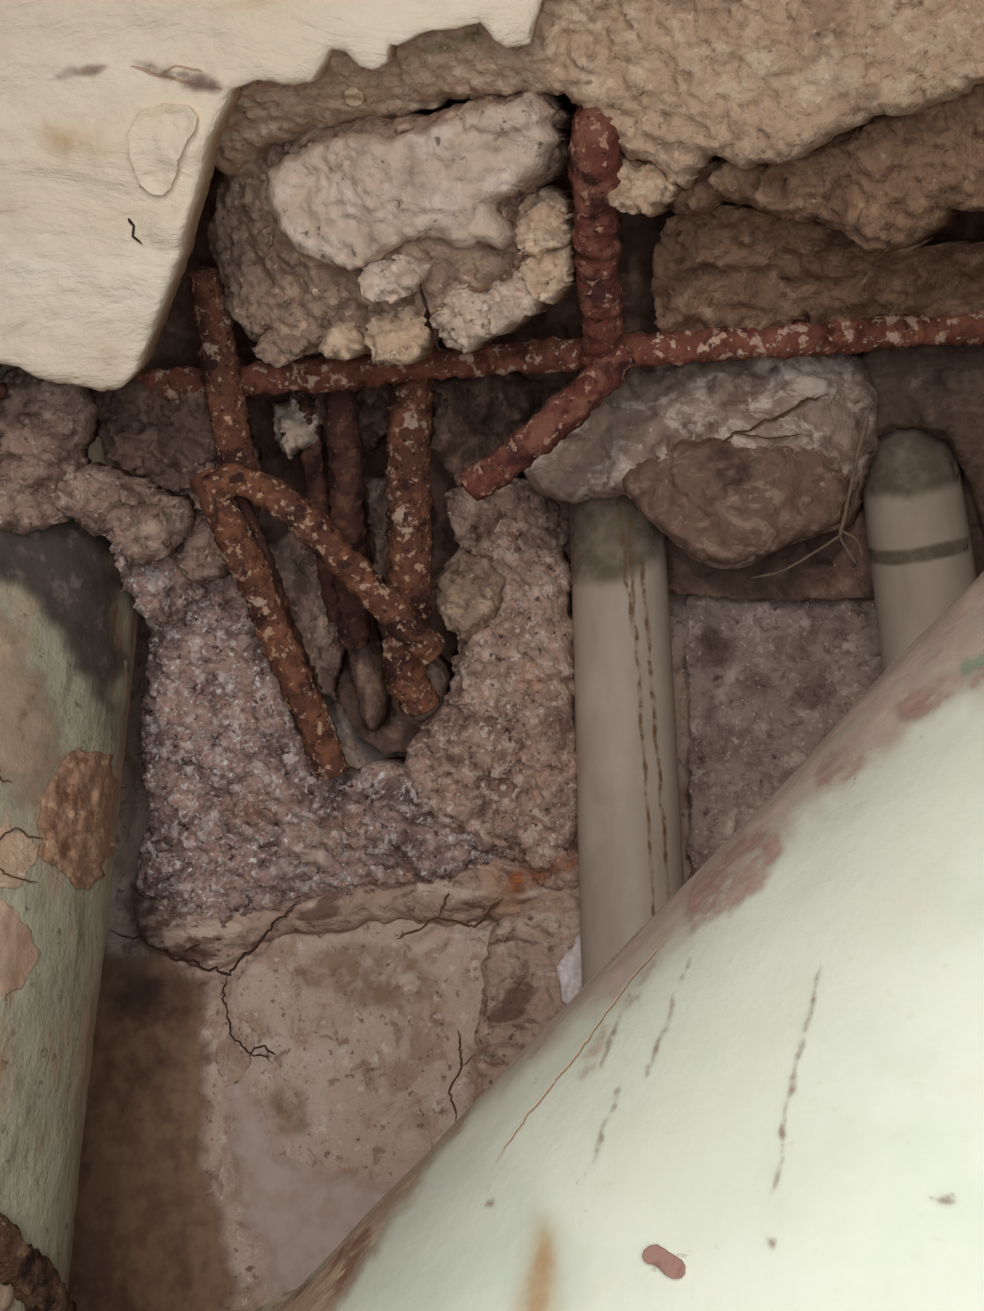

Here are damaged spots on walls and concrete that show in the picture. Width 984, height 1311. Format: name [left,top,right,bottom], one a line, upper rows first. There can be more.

spalling [0,0,984,801]
spalling [132,309,984,1093]
peeling [0,821,40,1000]
crack [0,827,41,883]
crack [109,903,300,1063]
crack [397,893,504,939]
crack [448,1030,476,1121]
corrosion [277,1110,469,1311]